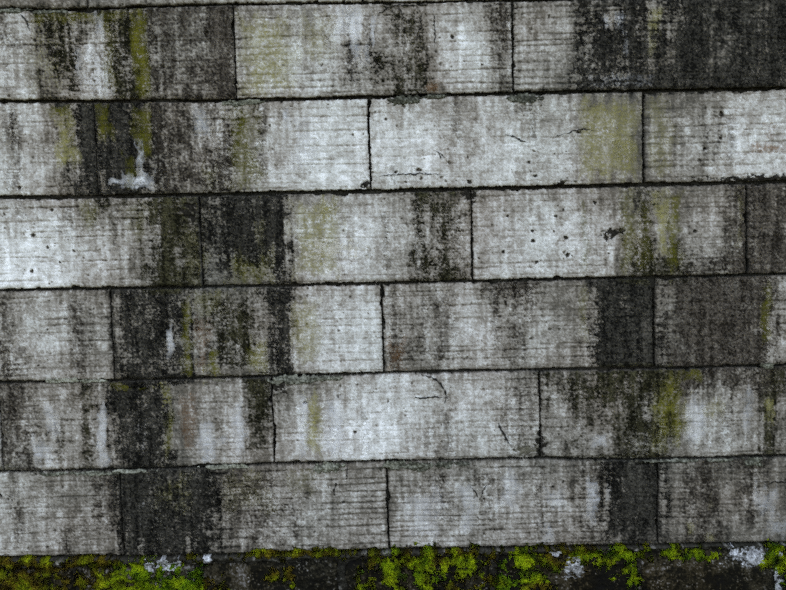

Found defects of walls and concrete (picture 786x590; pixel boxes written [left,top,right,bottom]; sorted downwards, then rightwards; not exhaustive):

leakage [491,2,518,69]
leakage [569,0,786,94]
leakage [25,2,297,555]
crack [415,375,449,404]
leakage [515,184,786,544]